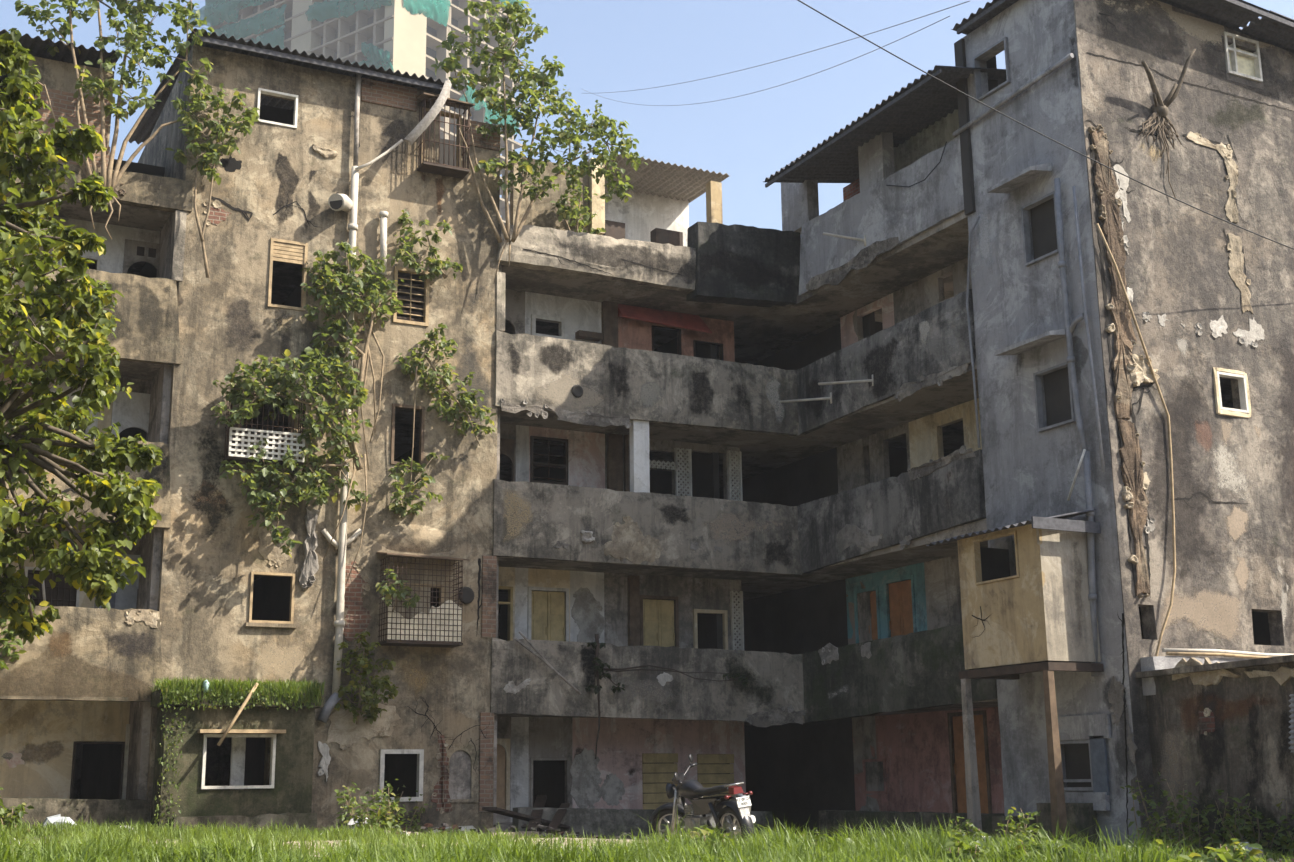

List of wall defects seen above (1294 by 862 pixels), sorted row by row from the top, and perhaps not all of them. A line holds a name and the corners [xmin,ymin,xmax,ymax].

water stain [275,153,320,228]
spalling [1088,124,1264,638]
water stain [659,506,690,525]
water stain [1149,378,1246,578]
water stain [1278,433,1294,526]